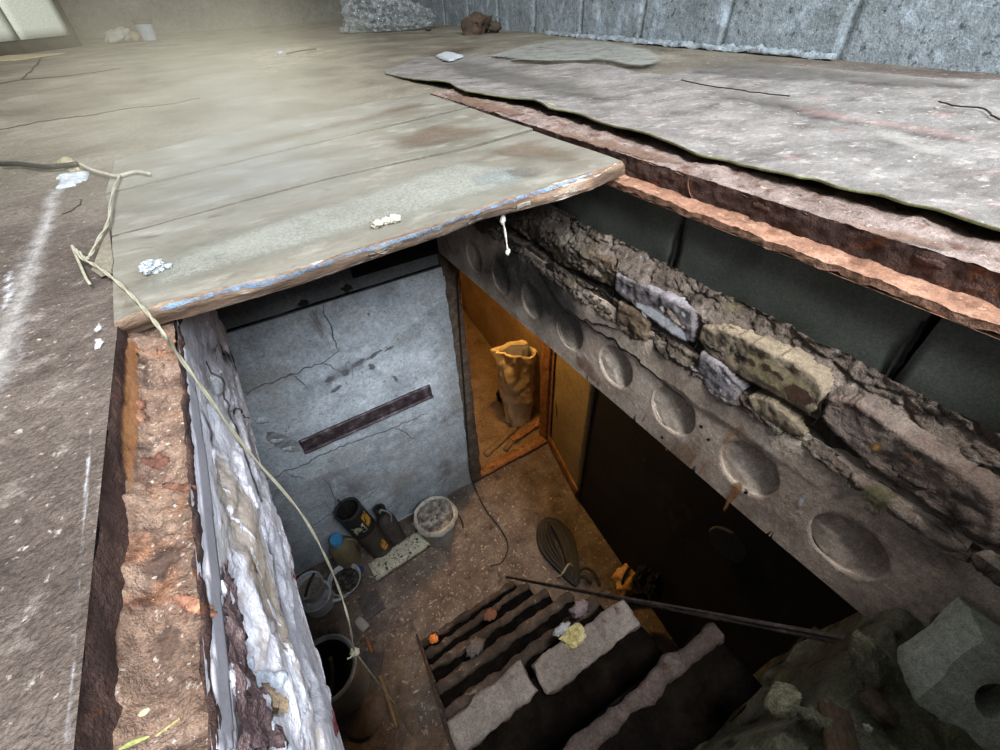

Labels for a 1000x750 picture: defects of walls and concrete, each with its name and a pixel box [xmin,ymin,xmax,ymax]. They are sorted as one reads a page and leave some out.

crack [2,57,120,83]
crack [681,79,790,97]
crack [0,98,199,130]
crack [938,101,1000,120]
crack [205,304,424,526]
spalling [212,448,297,750]